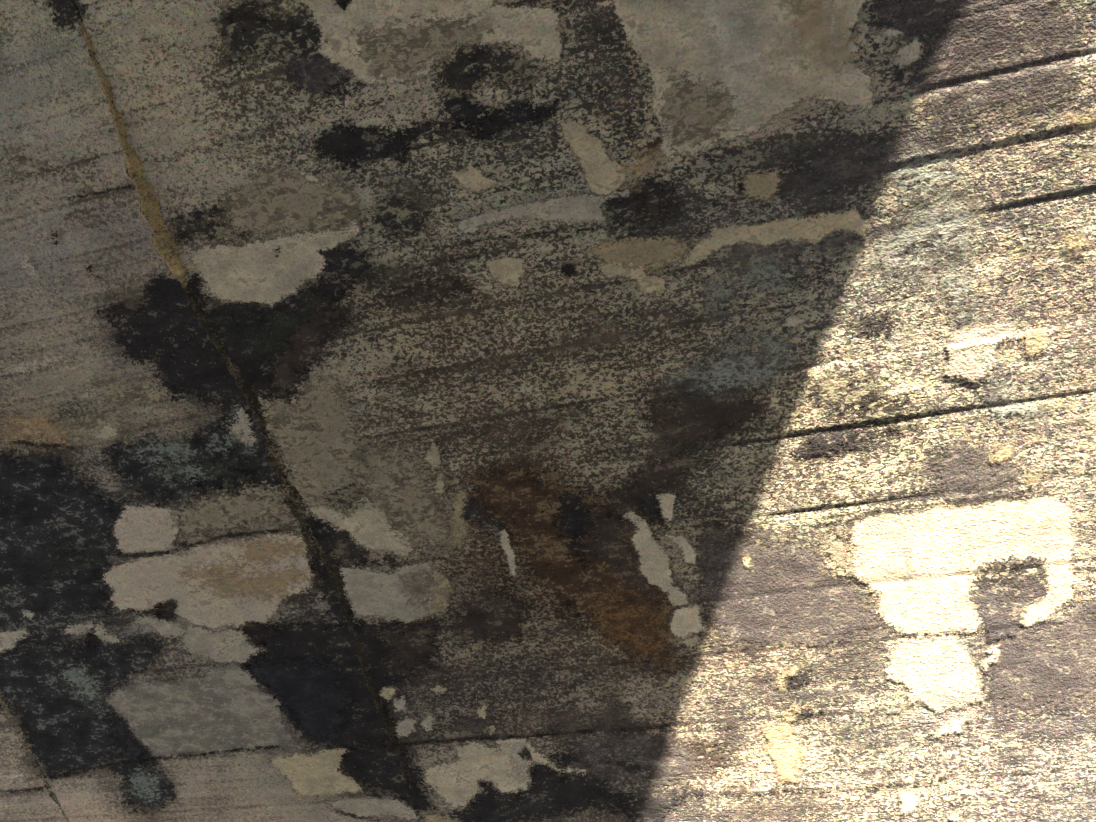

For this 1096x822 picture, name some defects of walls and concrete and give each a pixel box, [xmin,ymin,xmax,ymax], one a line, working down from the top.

peeling [301,0,564,87]
peeling [457,0,878,249]
crack [66,184,134,200]
peeling [190,155,367,308]
peeling [582,207,870,296]
water stain [210,291,354,401]
crack [116,529,281,559]
peeling [102,373,586,822]
corrosion [446,381,773,688]
peeling [812,474,1079,738]
water stain [107,706,168,810]
crack [326,807,379,822]